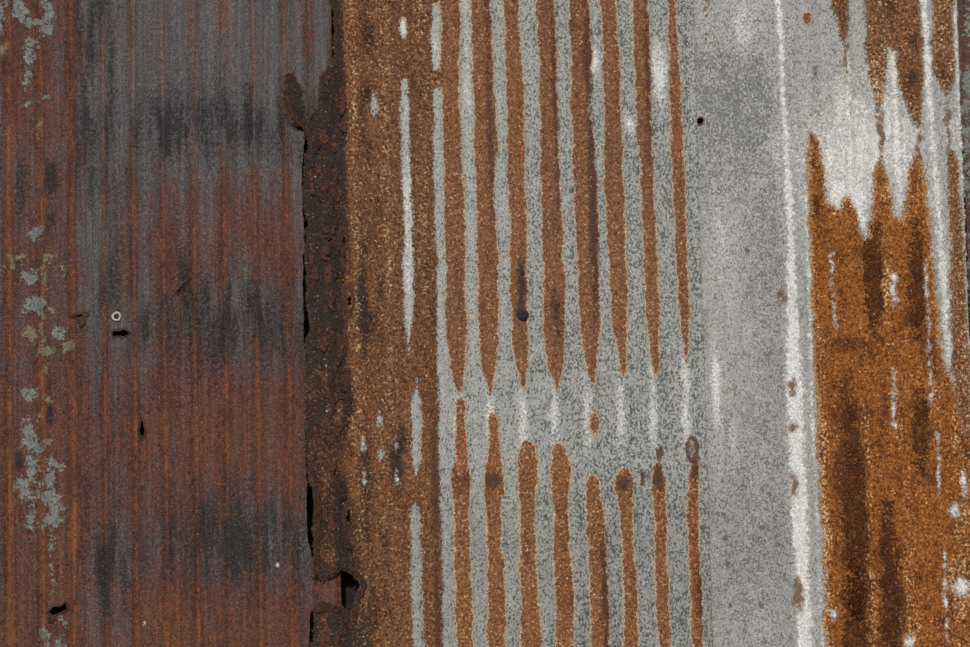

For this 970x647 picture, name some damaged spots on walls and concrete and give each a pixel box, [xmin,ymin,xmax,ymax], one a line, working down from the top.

peeling [0,0,57,107]
corrosion [666,0,692,366]
corrosion [801,0,812,27]
peeling [960,64,970,218]
peeling [961,0,970,51]
peeling [0,225,75,601]
corrosion [281,0,672,647]
corrosion [805,0,970,647]
peeling [38,615,67,647]
corrosion [685,435,706,647]